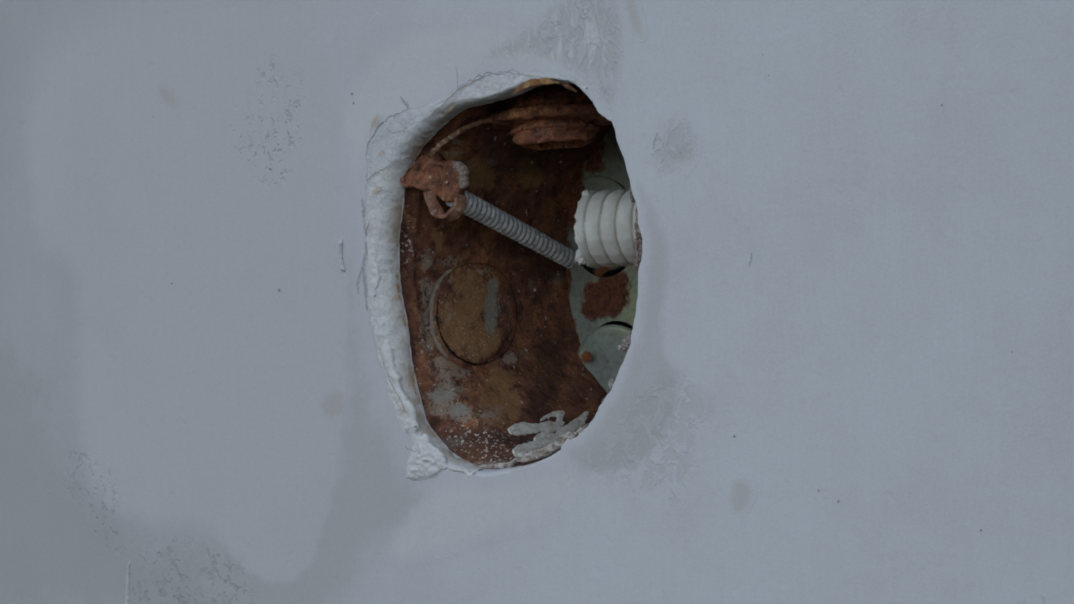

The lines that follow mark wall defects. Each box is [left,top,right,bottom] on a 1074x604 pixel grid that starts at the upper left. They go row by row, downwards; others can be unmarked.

corrosion [514,77,576,93]